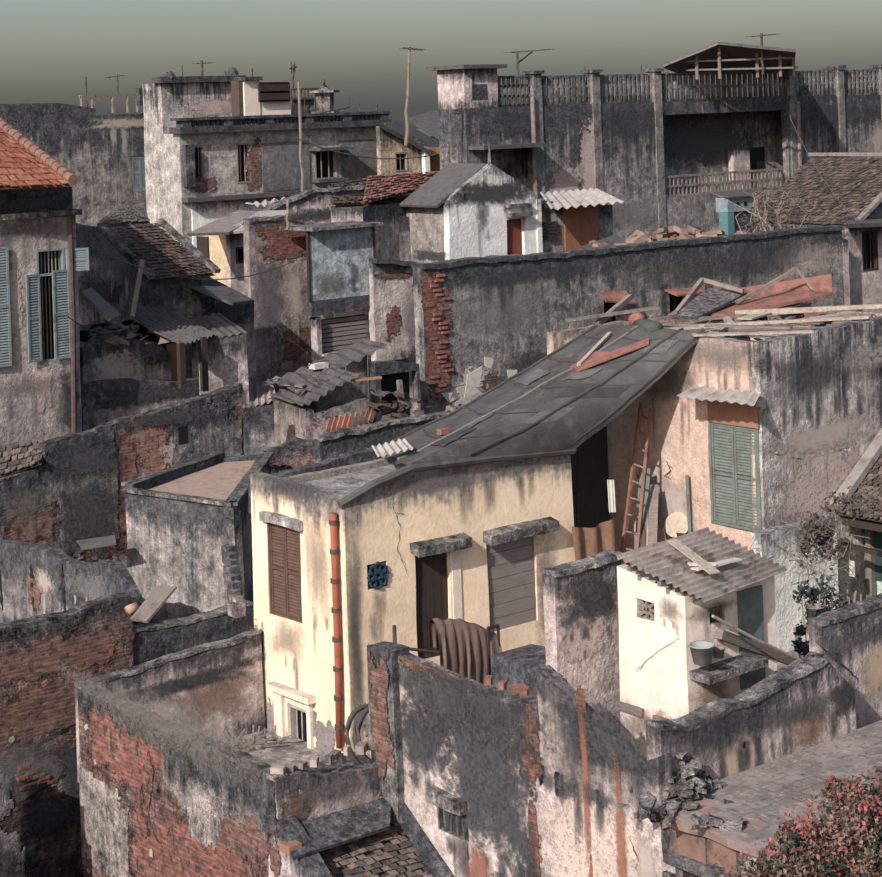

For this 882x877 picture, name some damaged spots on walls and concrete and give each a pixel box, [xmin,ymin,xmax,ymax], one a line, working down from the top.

damp [441,179,539,226]
spalling [374,269,502,408]
spalling [118,406,185,546]
damp [767,345,882,497]
crack [636,638,680,671]
spalling [0,628,281,877]
peeling [313,710,336,754]
damp [399,664,542,877]
peeling [509,703,657,877]
rust [579,715,593,877]
damp [543,701,661,833]
rust [615,772,626,877]